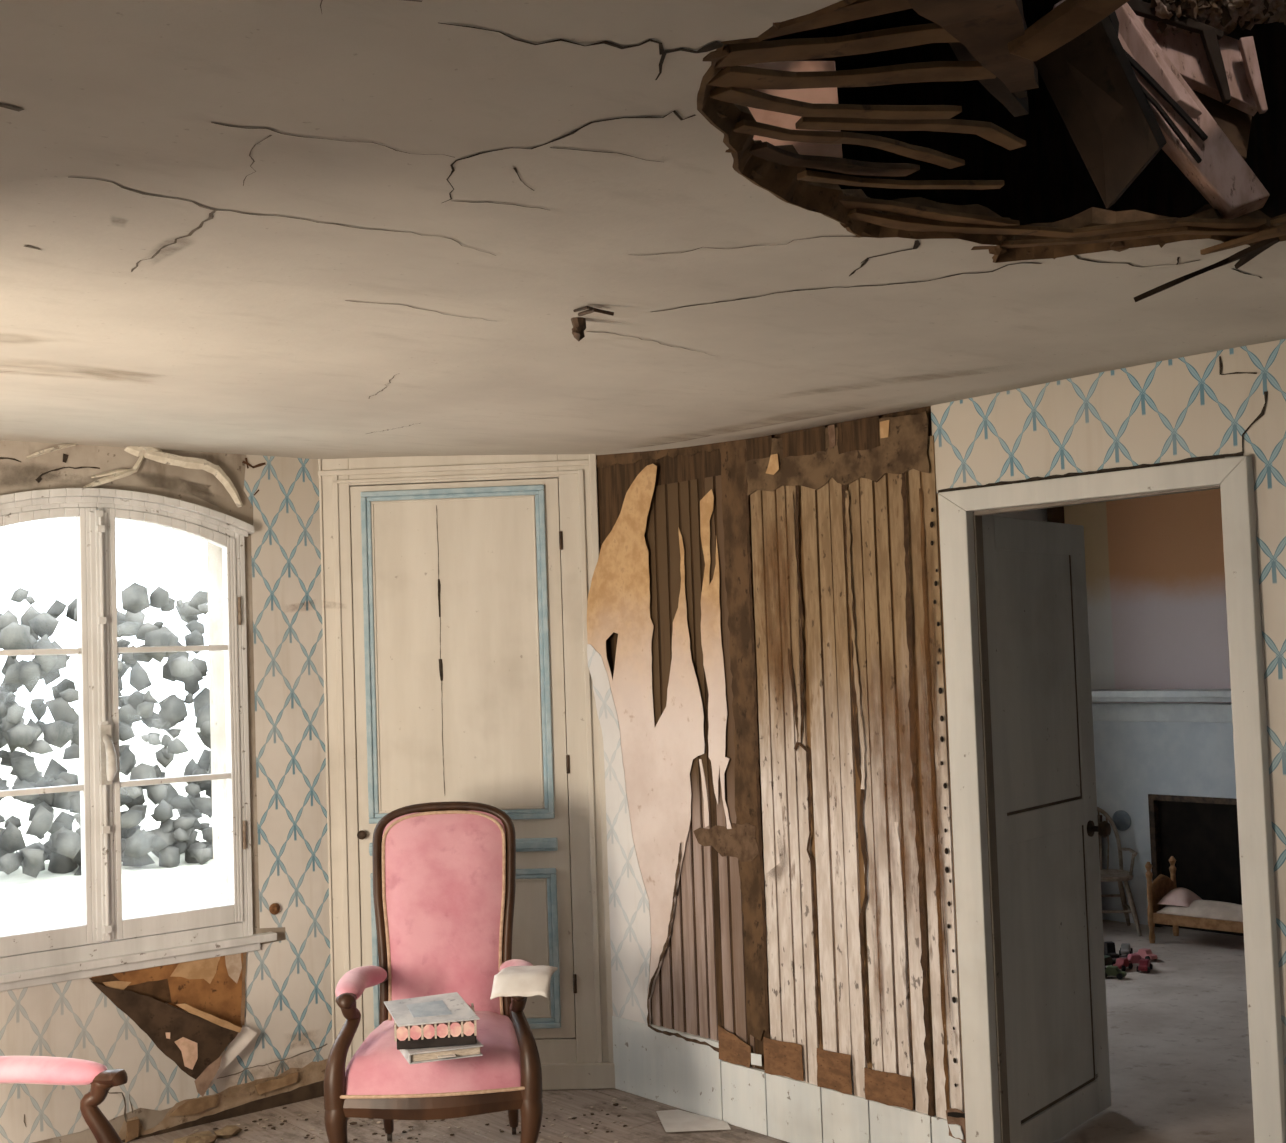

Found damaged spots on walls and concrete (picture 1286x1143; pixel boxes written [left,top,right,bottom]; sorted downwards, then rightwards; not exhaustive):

crack [68,110,696,272]
crack [404,0,727,80]
spalling [697,0,1286,263]
peeling [82,446,243,507]
crack [938,356,1268,493]
peeling [790,492,801,742]
peeling [845,491,865,789]
peeling [894,822,911,1071]